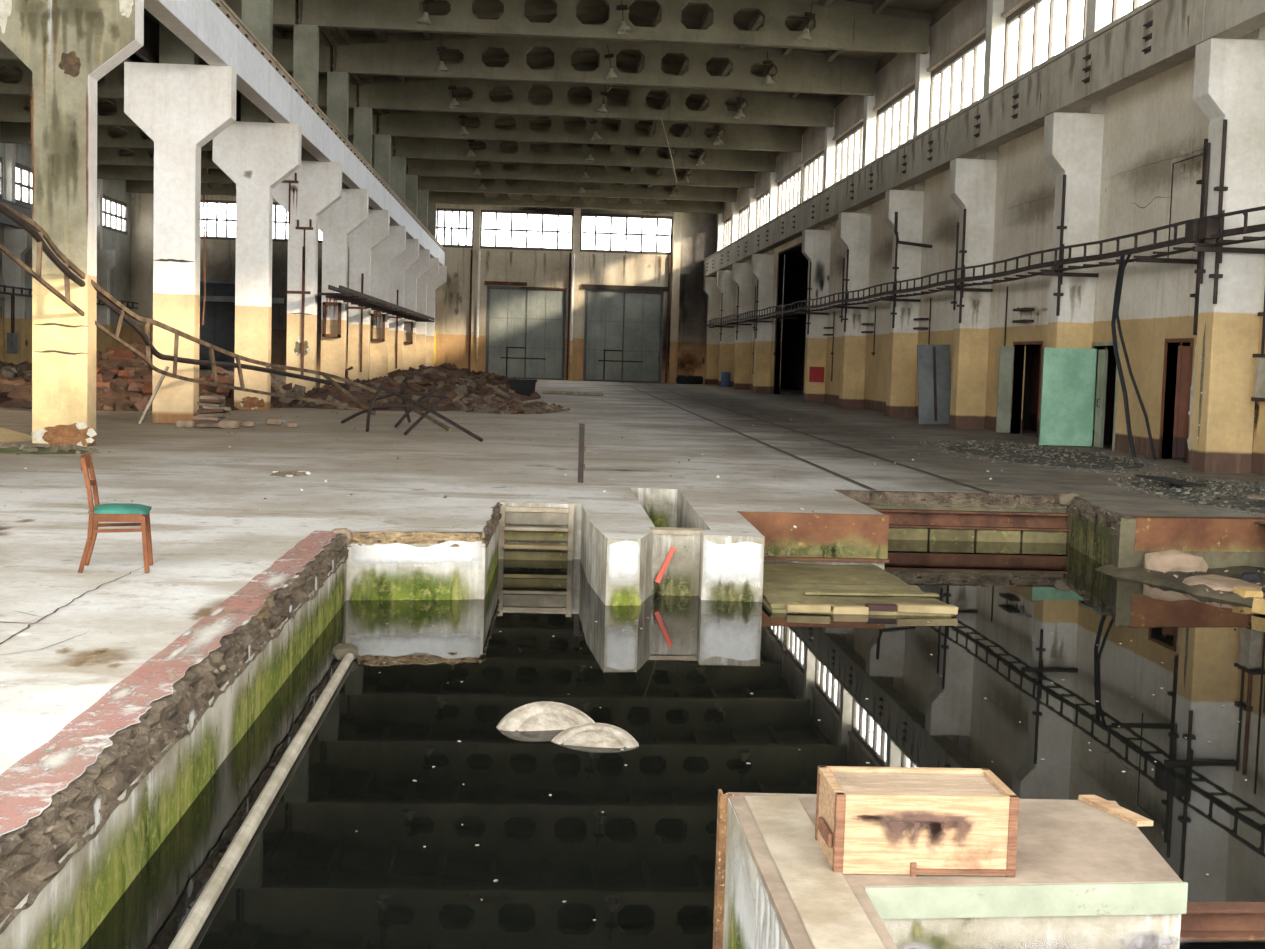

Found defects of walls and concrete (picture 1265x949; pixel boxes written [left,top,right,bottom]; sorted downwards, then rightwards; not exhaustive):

leakage [21,0,118,50]
spalling [58,51,81,77]
leakage [37,98,77,197]
spalling [31,422,97,447]
crack [0,559,161,655]
leakage [196,590,269,621]
leakage [620,575,670,606]
leakage [717,584,753,602]
leakage [281,577,318,686]
leakage [60,649,121,667]
spalling [0,502,590,935]